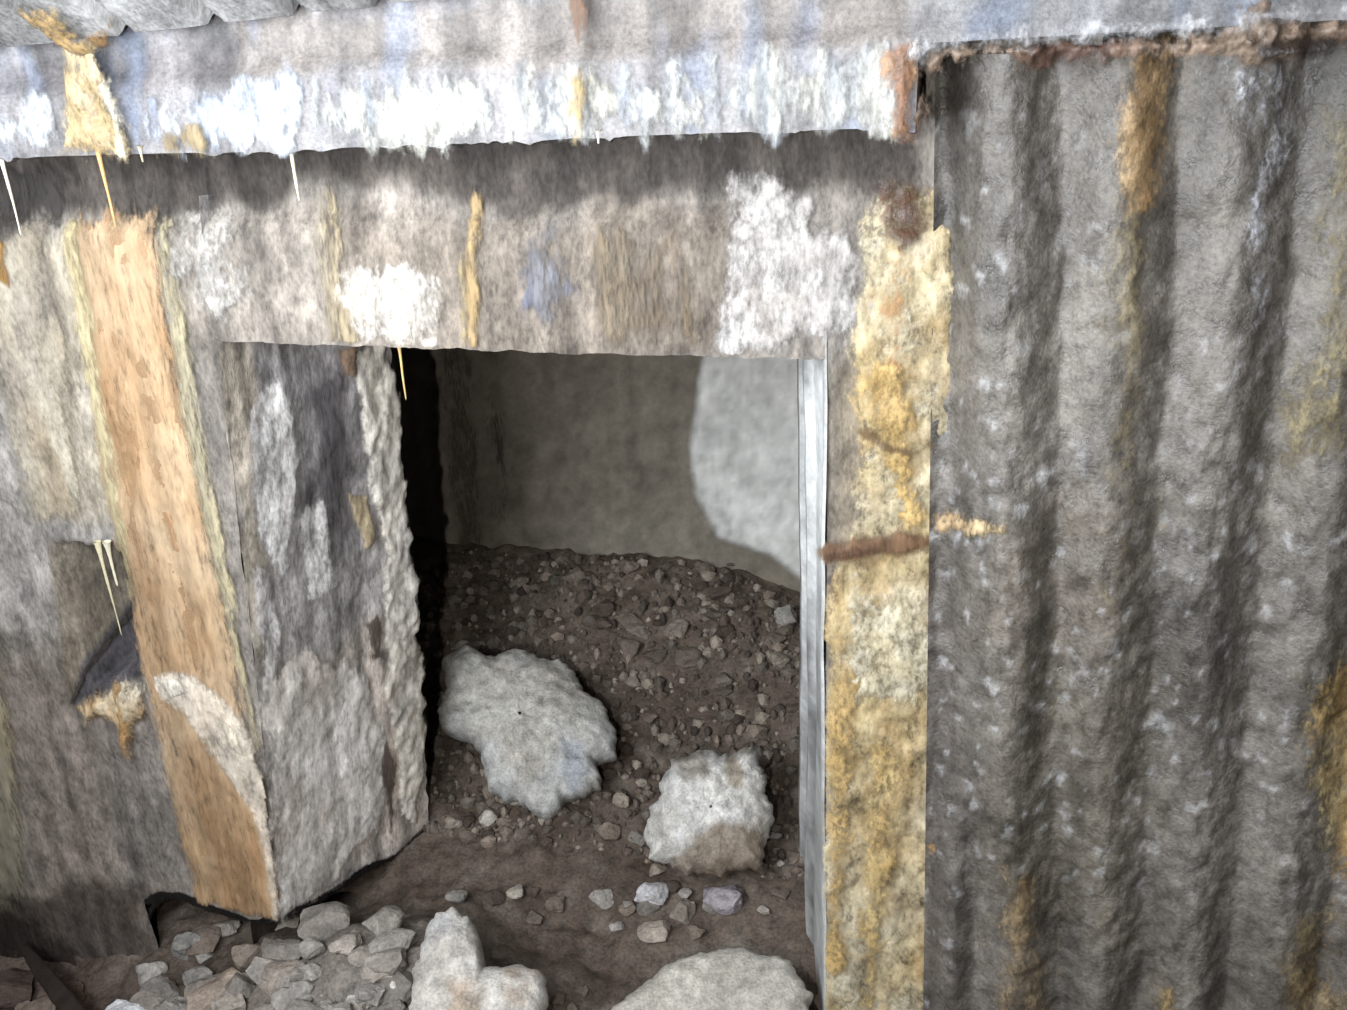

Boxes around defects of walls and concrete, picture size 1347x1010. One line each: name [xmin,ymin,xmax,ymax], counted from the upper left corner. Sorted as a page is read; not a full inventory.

water stain [144,71,493,157]
water stain [507,42,896,147]
corrosion [880,0,1347,212]
corrosion [458,192,483,347]
water stain [851,347,925,530]
corrosion [61,212,279,919]
corrosion [1304,665,1347,879]